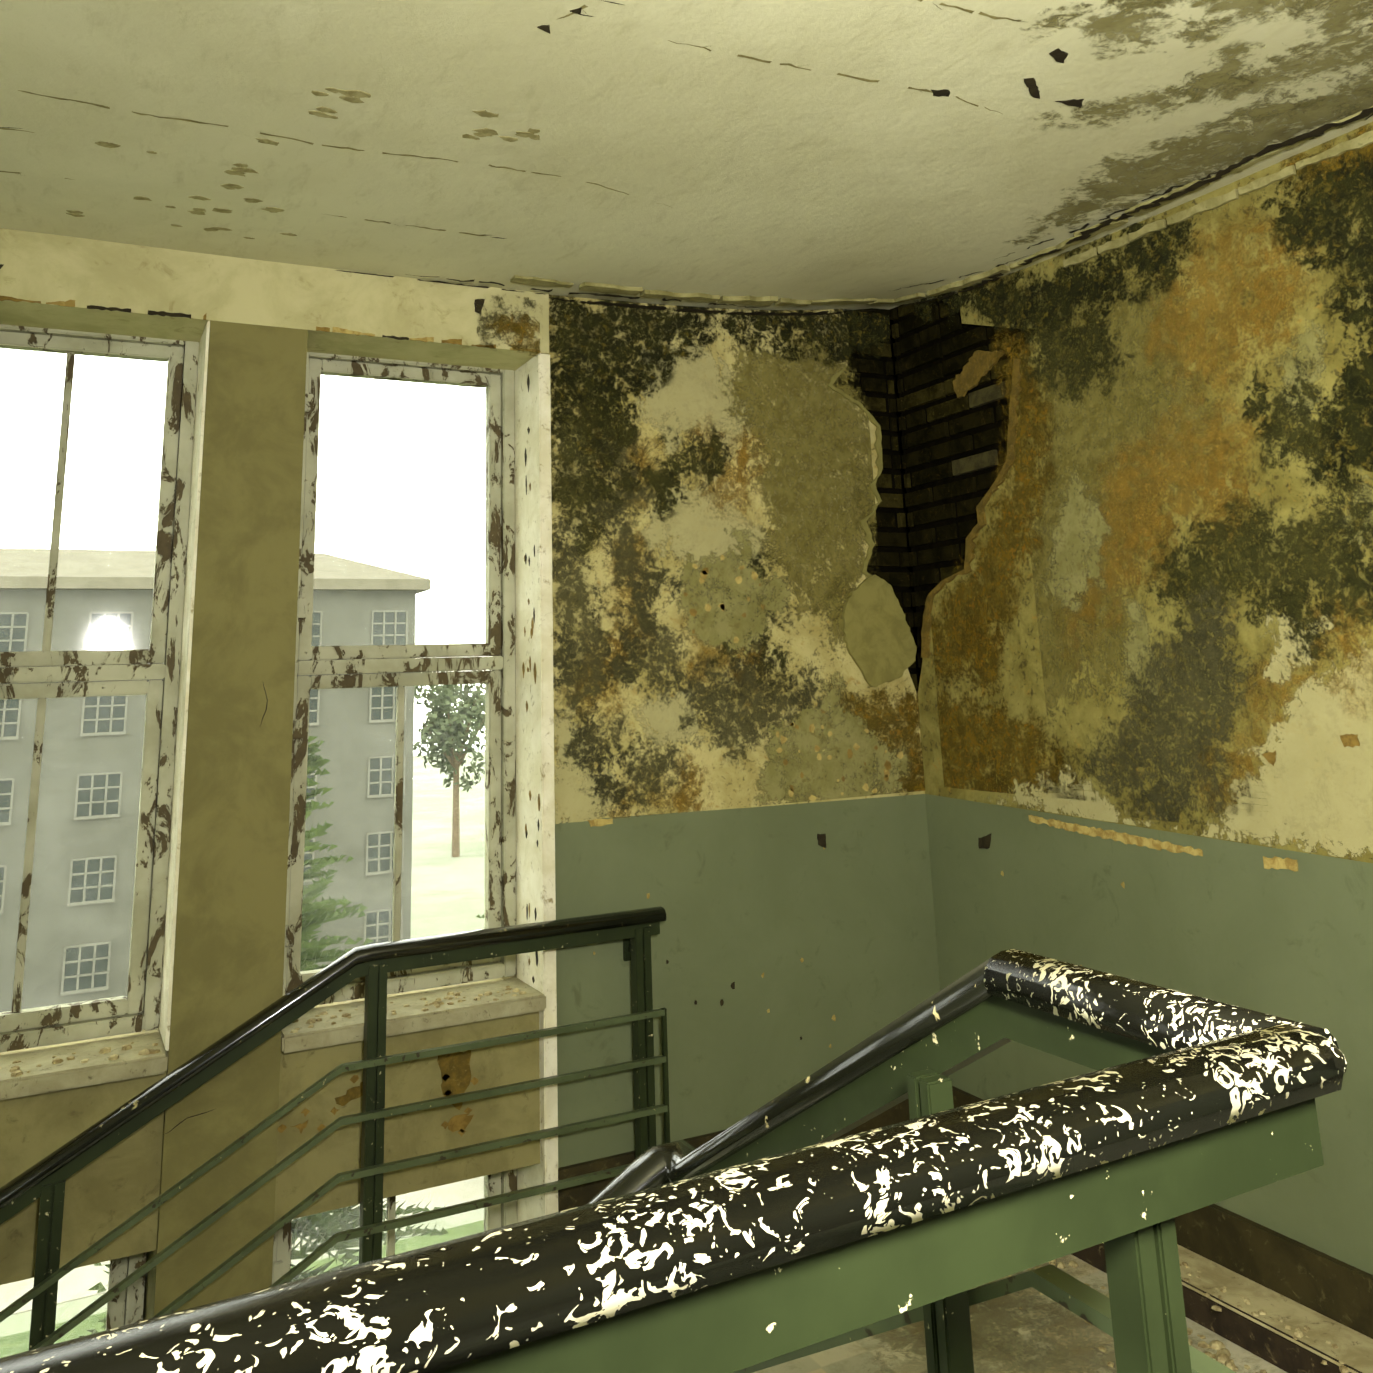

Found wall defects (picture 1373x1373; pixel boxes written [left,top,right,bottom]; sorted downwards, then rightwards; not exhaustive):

peeling [309,88,371,119]
peeling [462,110,540,142]
flaking render [931,89,950,97]
flaking render [1024,78,1084,108]
flaking render [1049,48,1068,63]
peeling [133,163,284,239]
leakage [913,0,1373,402]
flaking render [510,106,1373,806]
leakage [1080,153,1373,824]
peeling [525,703,627,847]